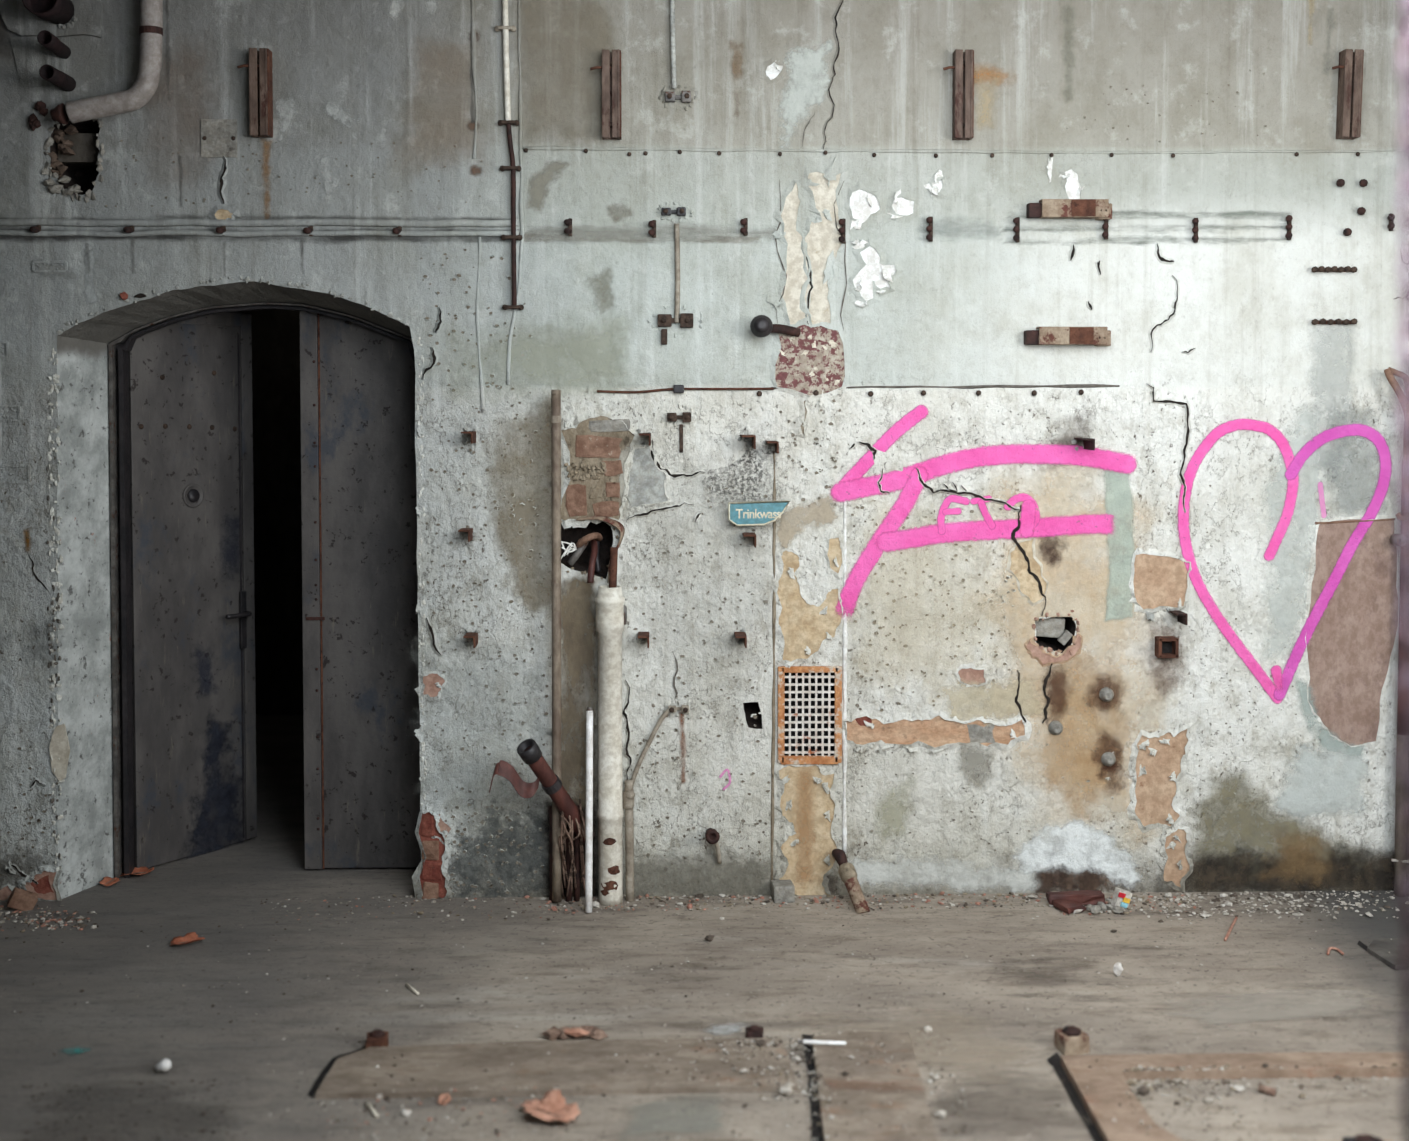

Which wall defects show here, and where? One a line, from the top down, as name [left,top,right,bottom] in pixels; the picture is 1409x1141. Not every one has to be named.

crack [802,0,845,152]
spalling [28,101,123,207]
peeling [120,286,179,303]
crack [775,180,847,330]
peeling [767,157,947,508]
crack [1147,243,1196,513]
peeling [199,248,1083,899]
crack [849,441,1046,616]
crack [1015,663,1053,724]
peeling [1086,722,1231,892]
damp [1168,777,1394,892]